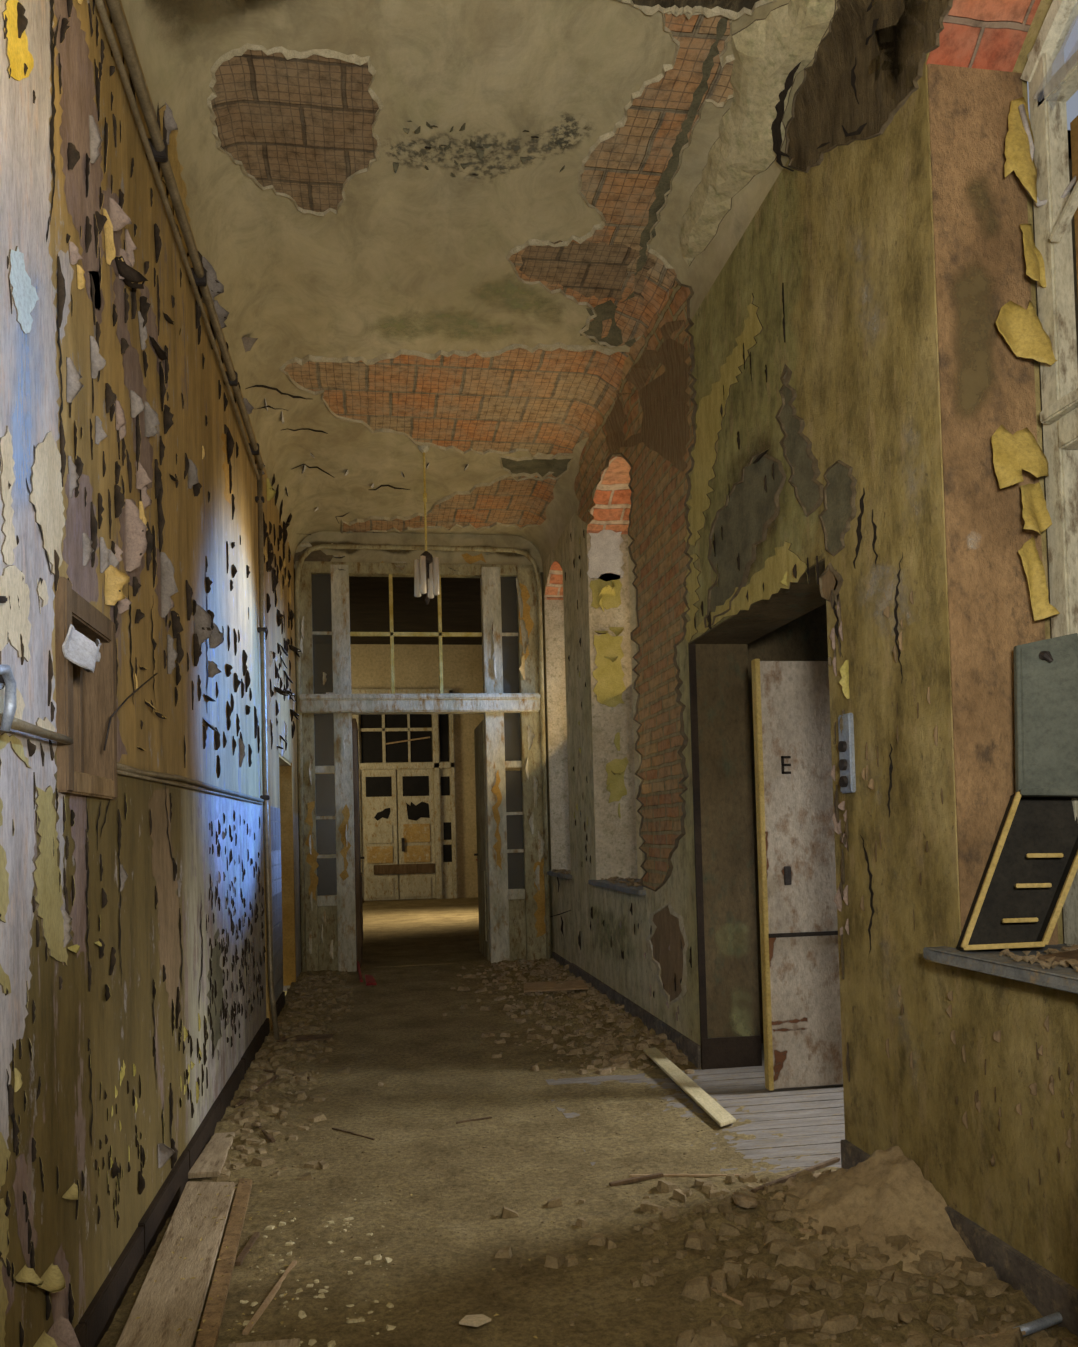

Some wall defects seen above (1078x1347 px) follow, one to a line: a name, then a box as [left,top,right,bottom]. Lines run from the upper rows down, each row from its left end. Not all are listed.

peeling [1004,97,1037,203]
peeling [1020,224,1046,288]
peeling [995,300,1058,366]
peeling [991,425,1060,621]
peeling [830,765,865,979]